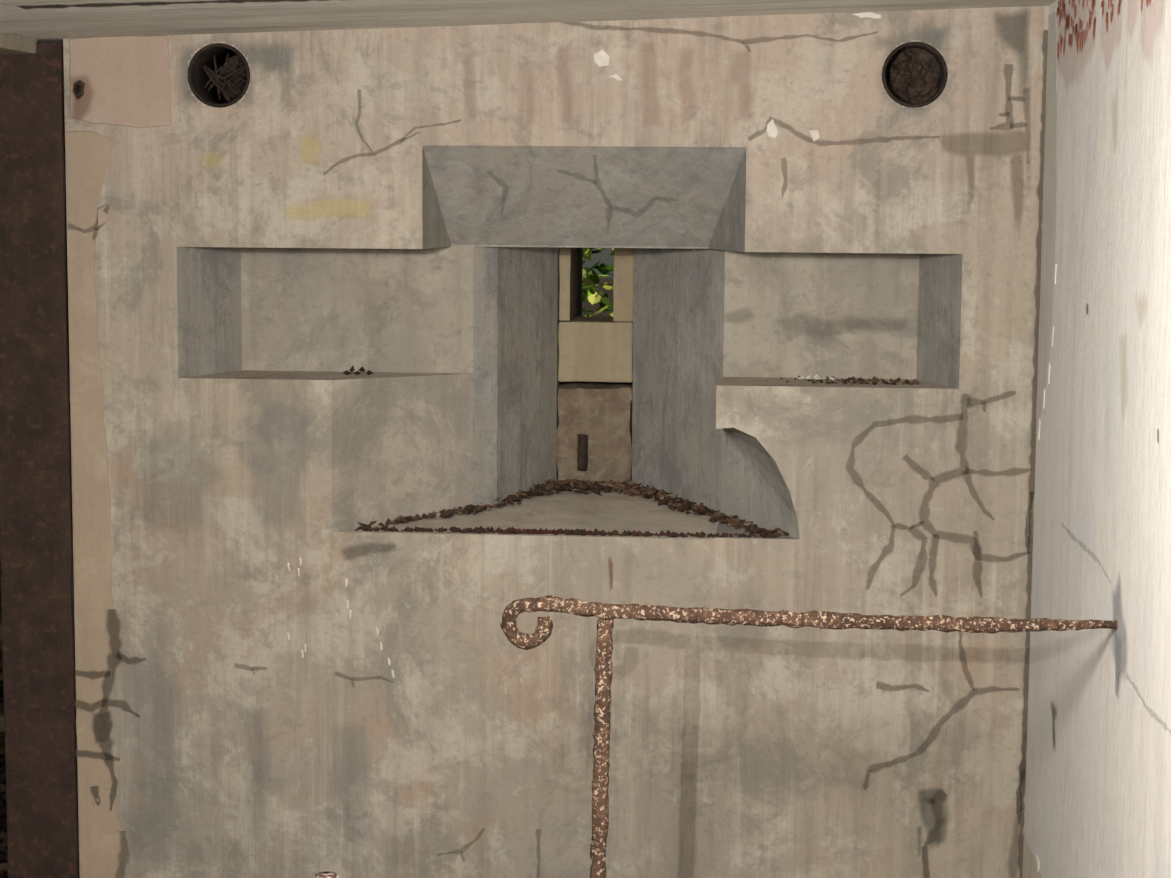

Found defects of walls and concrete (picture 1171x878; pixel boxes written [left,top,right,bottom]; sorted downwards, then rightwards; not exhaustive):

corrosion [1056,0,1122,58]
leakage [1114,588,1125,694]
crack [74,609,146,811]